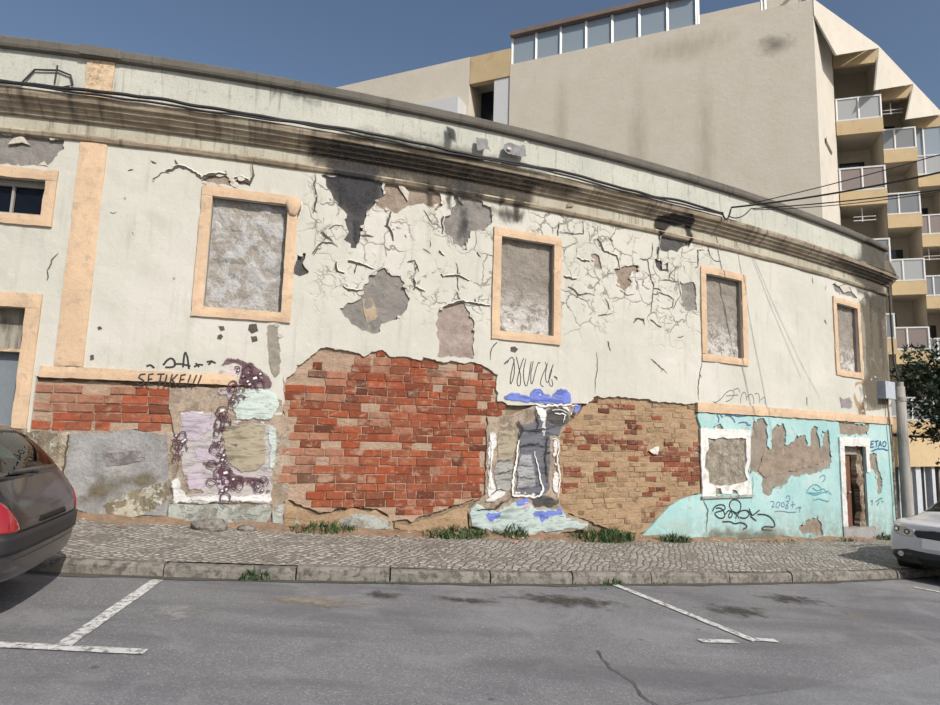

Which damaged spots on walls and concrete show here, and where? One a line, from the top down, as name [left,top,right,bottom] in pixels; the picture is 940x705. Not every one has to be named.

spalling [0,135,64,167]
crack [128,160,255,184]
spalling [340,268,409,334]
crack [297,175,490,308]
spalling [322,175,494,250]
water stain [310,126,579,221]
crack [557,224,719,338]
water stain [839,239,897,408]
spalling [31,379,174,432]
spalling [267,302,506,522]
spalling [558,396,701,534]
spalling [749,418,834,496]